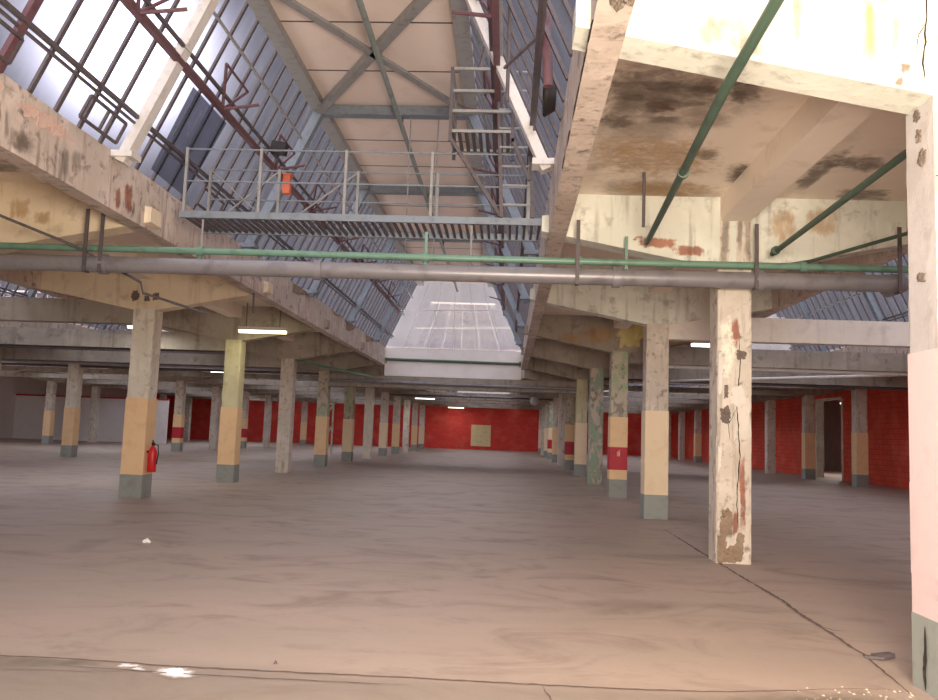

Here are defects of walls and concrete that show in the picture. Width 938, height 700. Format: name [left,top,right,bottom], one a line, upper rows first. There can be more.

damp [678,4,758,56]
damp [750,34,775,62]
damp [858,0,880,78]
damp [900,0,938,13]
crack [916,0,928,78]
damp [0,95,41,174]
damp [579,58,805,197]
damp [764,139,906,250]
damp [719,216,751,272]
peeling [718,306,747,424]
spalling [717,508,745,563]
crack [666,530,927,693]